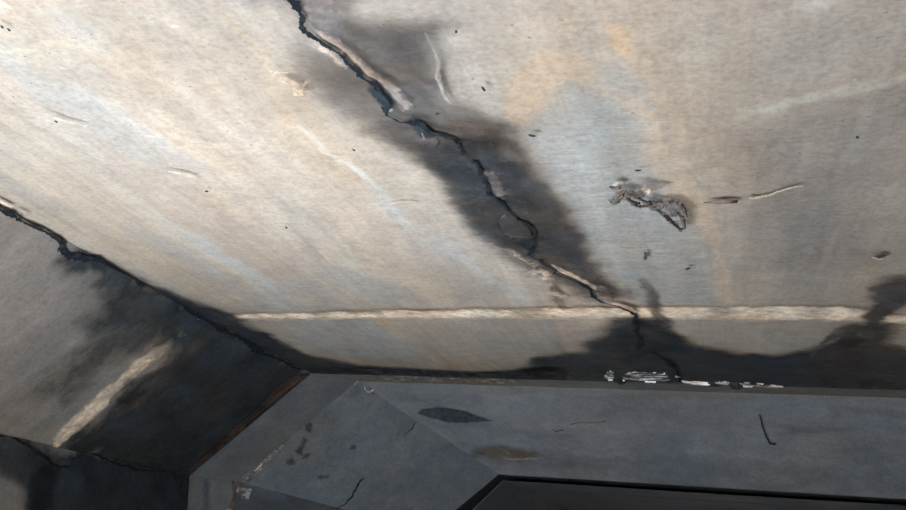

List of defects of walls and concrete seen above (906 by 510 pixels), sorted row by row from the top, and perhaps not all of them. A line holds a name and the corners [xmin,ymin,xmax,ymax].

peeling [314,29,435,140]
leakage [299,0,619,306]
crack [287,0,681,382]
crack [0,209,152,290]
crack [172,300,314,374]
leakage [0,250,906,510]
crack [336,478,364,509]